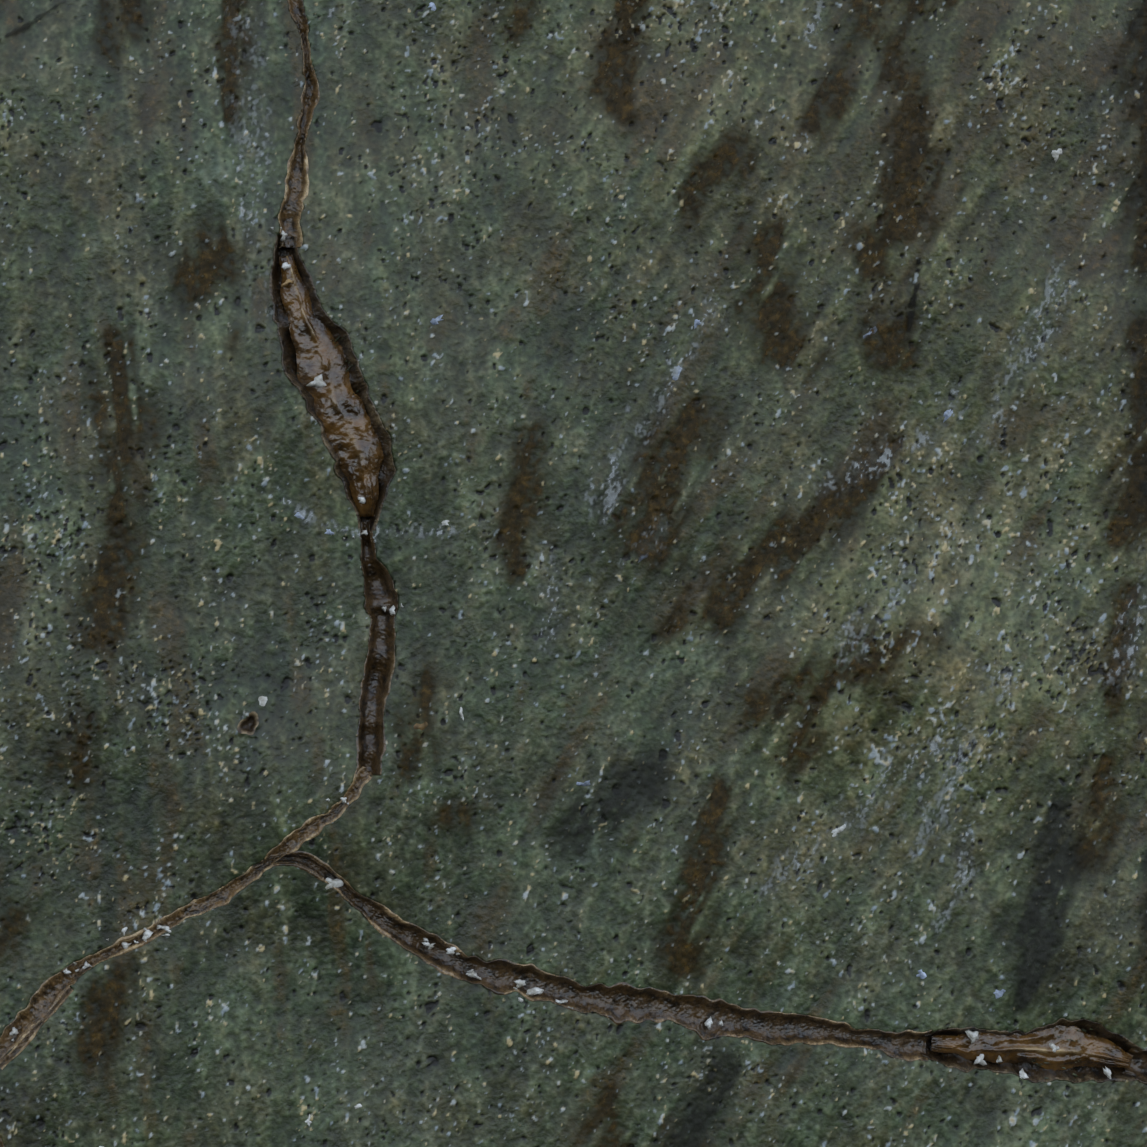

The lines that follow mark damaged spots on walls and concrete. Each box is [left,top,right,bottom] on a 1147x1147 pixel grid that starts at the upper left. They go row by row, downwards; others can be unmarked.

crack [6,3,62,37]
crack [271,0,320,248]
crack [907,259,921,332]
crack [0,522,932,1070]
crack [1122,1047,1147,1084]